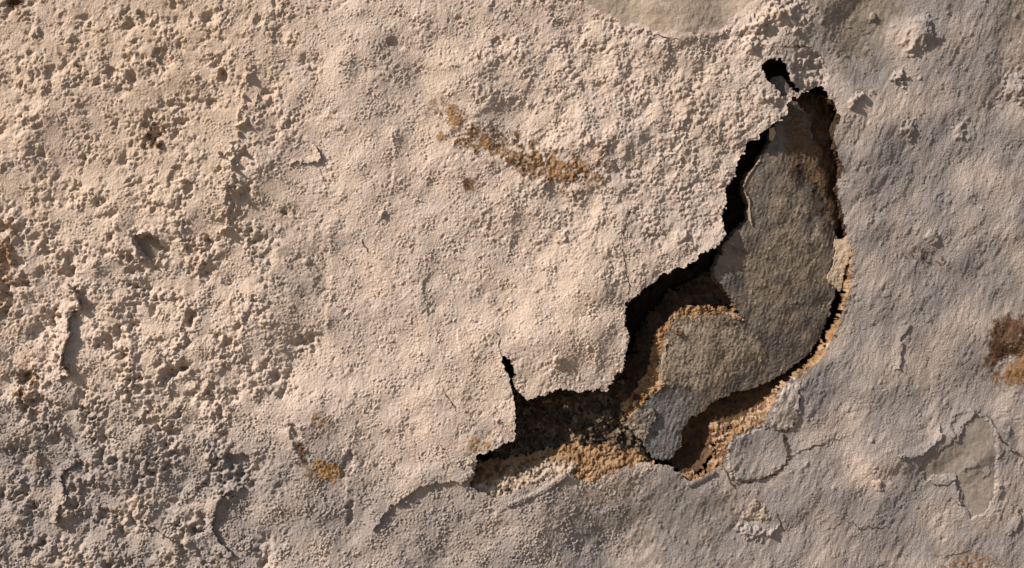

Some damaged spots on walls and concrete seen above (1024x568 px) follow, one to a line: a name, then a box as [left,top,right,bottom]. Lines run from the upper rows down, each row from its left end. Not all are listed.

rust [425,99,616,193]
spalling [359,58,854,531]
rust [983,313,1024,384]
rust [296,442,341,483]
crack [723,380,848,500]
peeling [898,407,1024,535]